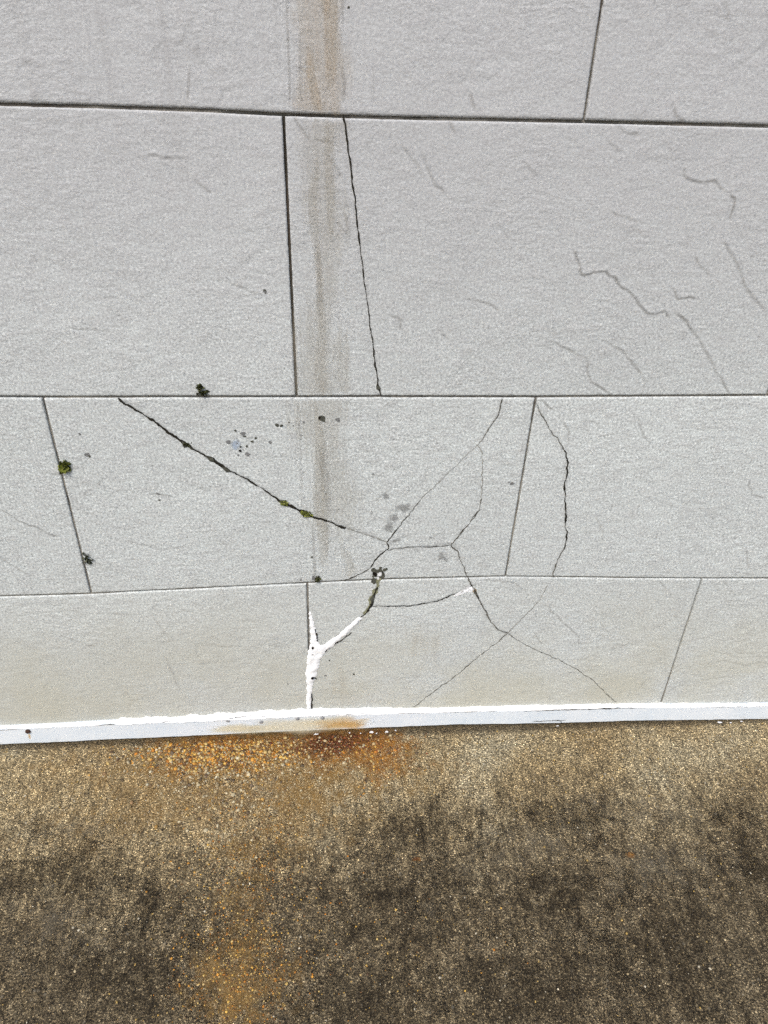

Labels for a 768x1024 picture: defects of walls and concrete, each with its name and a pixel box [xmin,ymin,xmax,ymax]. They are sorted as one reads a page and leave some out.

crack [343,116,381,395]
crack [118,398,617,725]
corrosion [160,719,409,780]